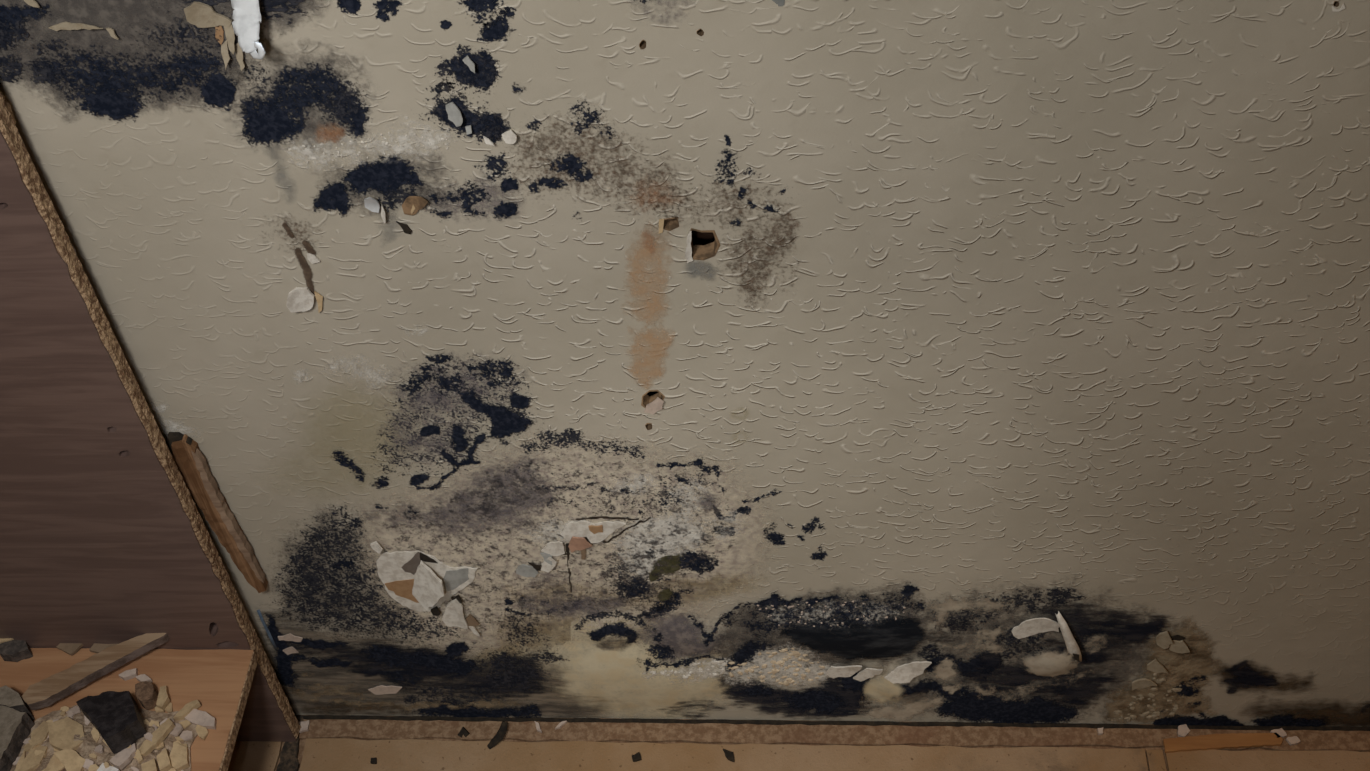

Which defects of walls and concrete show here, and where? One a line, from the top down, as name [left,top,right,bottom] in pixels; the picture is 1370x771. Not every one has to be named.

leakage [0,0,370,147]
leakage [313,0,798,296]
spalling [658,217,720,263]
flaking render [516,520,626,578]
leakage [263,354,1166,724]
flaking render [370,541,480,636]
flaking render [1012,611,1082,662]
flaking render [643,645,932,703]
leakage [1153,661,1370,727]